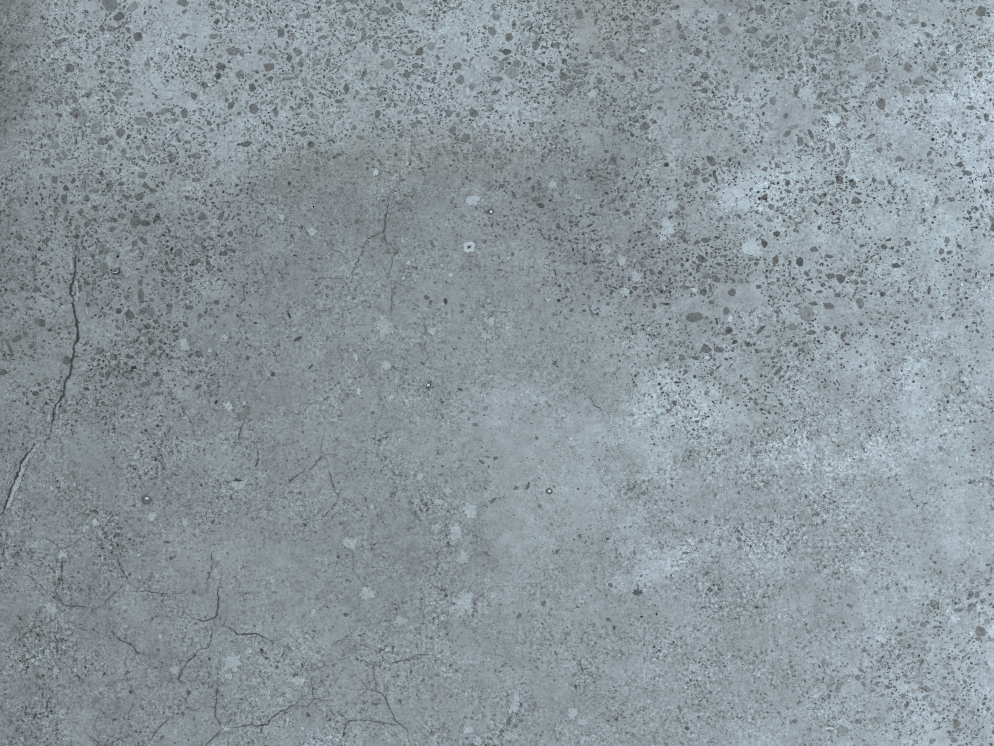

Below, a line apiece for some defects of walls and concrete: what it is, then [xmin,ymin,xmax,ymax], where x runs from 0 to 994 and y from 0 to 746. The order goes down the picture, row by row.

crack [0,219,81,515]
crack [1,423,456,746]